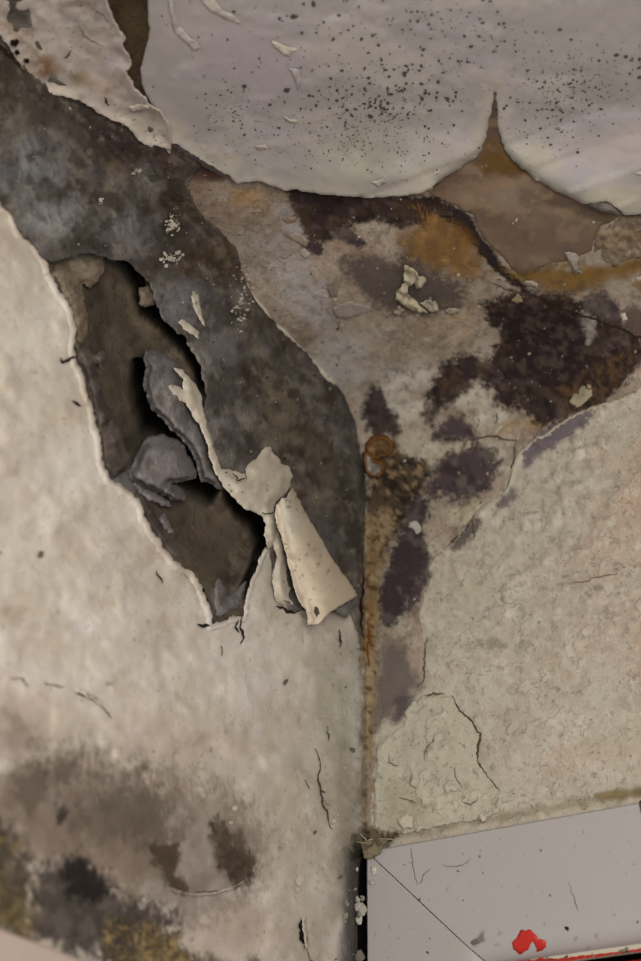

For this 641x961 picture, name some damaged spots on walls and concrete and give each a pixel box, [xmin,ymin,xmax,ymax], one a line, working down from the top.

leakage [189,0,641,181]
leakage [230,264,254,333]
crack [491,282,641,339]
peeling [0,0,641,737]
leakage [285,189,641,627]
corrosion [359,510,396,829]
crack [418,636,500,806]
leakage [57,807,69,824]
leakage [149,843,189,896]
leakage [208,814,255,888]
crack [299,916,312,961]